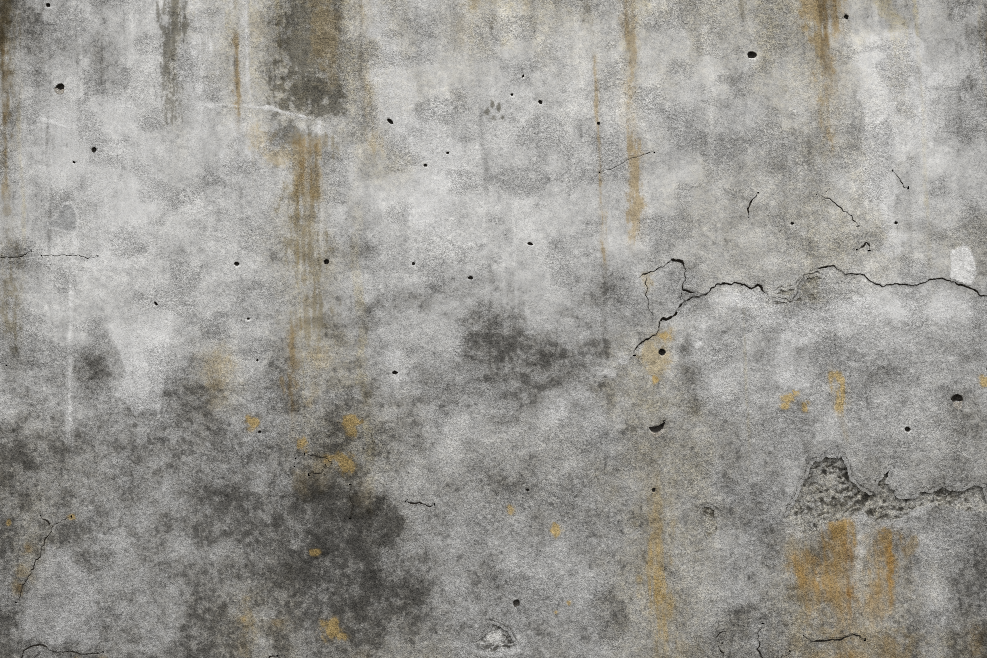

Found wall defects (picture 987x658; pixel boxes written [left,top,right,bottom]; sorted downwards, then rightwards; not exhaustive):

damp [145,0,363,360]
corrosion [228,7,380,519]
corrosion [591,0,652,281]
corrosion [639,270,657,297]
crack [632,187,987,355]
corrosion [783,0,853,174]
spalling [780,450,987,535]
corrosion [761,513,987,658]